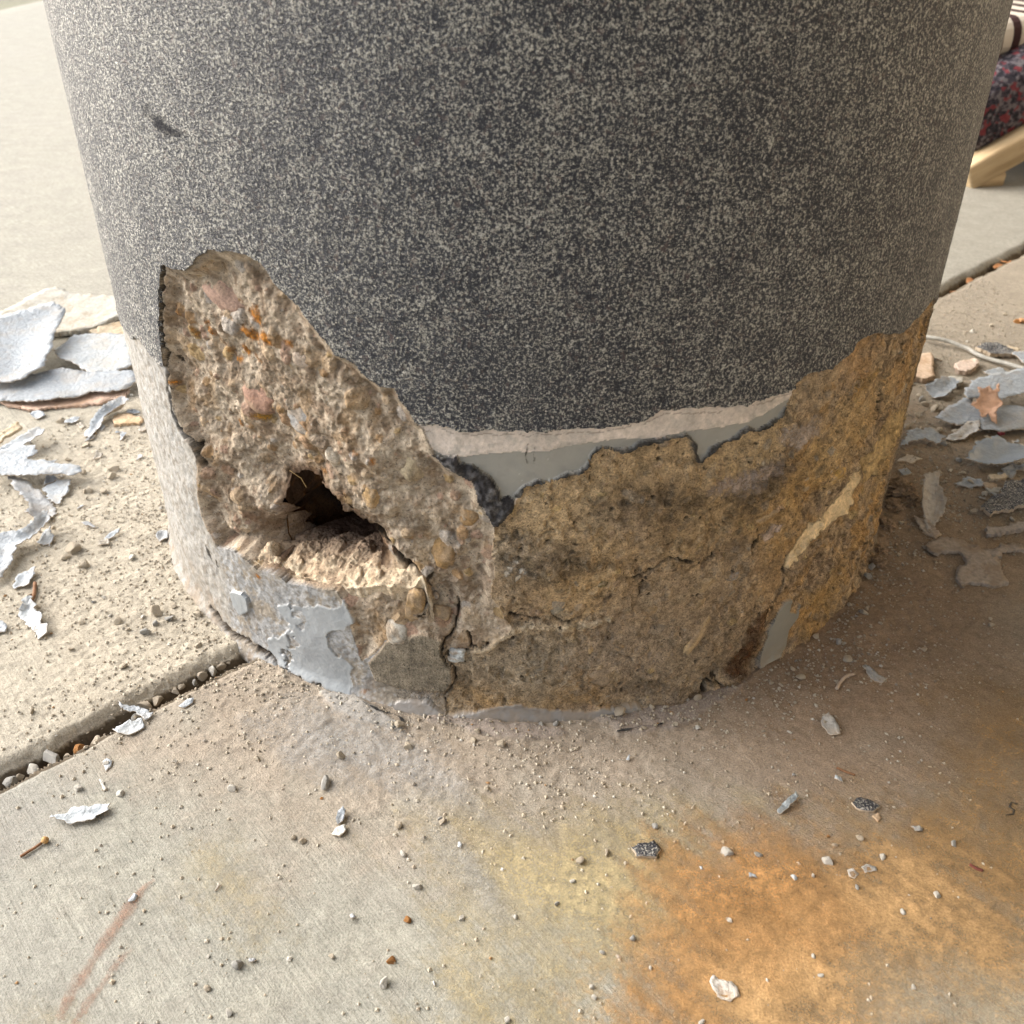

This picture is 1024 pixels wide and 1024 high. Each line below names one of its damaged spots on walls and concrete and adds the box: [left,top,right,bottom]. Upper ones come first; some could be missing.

peeling [158,249,1024,723]
crack [442,598,490,700]
rust [622,823,1024,1024]